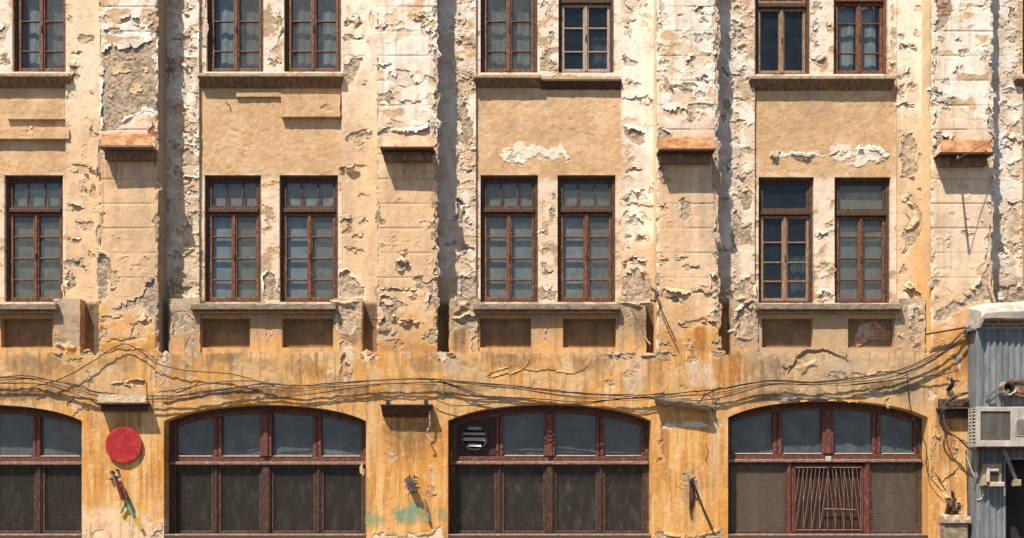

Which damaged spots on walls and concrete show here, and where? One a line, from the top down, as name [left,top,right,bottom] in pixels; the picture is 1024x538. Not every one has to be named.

flaking render [53,0,209,388]
flaking render [335,7,479,384]
crack [486,360,591,378]
flaking render [600,0,758,387]
peeling [770,150,815,161]
crack [780,348,902,403]
flaking render [830,0,1024,349]